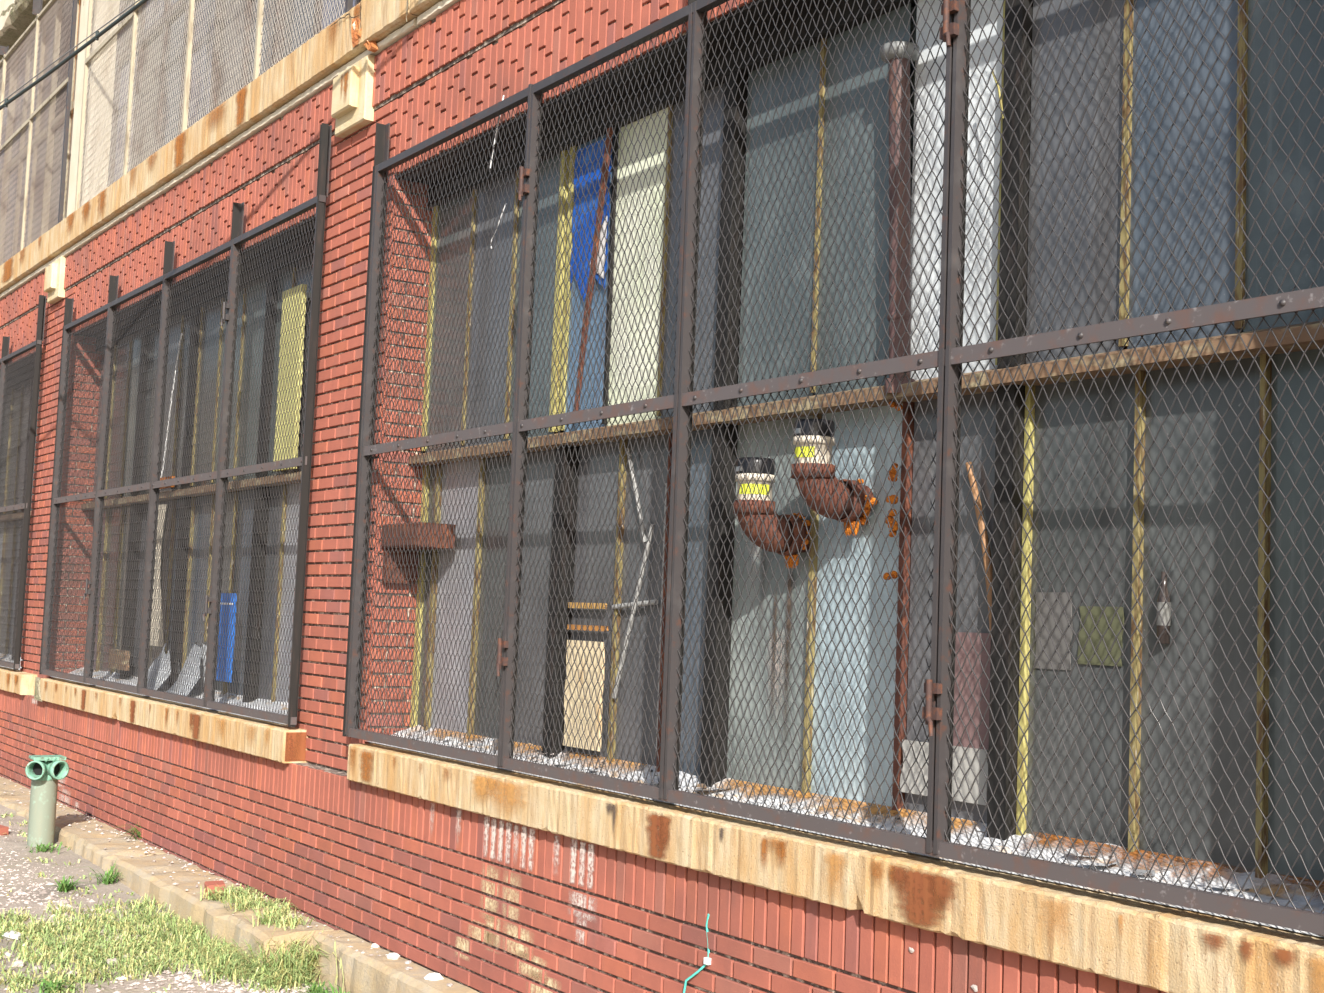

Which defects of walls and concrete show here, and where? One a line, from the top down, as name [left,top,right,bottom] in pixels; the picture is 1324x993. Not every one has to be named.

rust [211,87,246,126]
rust [175,132,185,168]
rust [67,190,105,229]
rust [119,698,200,739]
rust [285,732,307,761]
rust [351,749,372,781]
rust [720,779,920,818]
rust [647,814,671,858]
rust [1033,832,1229,876]
water stain [456,817,556,993]
water stain [554,836,594,944]
rust [872,863,956,926]